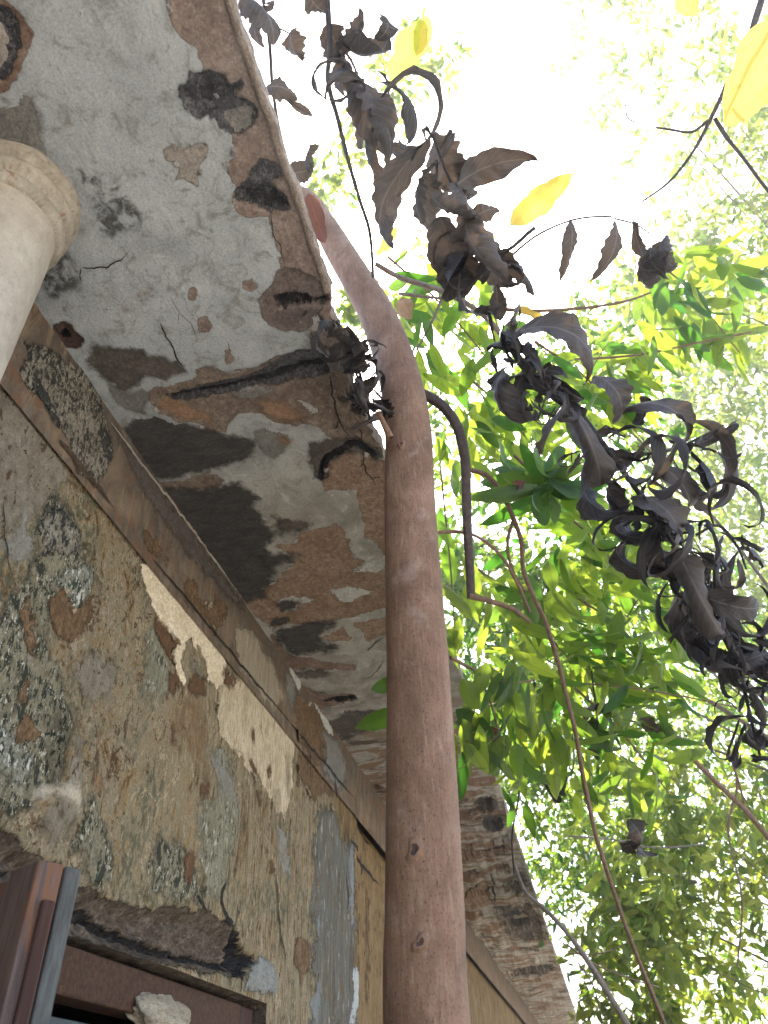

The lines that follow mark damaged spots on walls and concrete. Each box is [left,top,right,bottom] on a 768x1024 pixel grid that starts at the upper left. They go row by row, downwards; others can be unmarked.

peeling [0,0,34,93]
crack [79,252,128,283]
peeling [148,0,386,673]
crack [160,299,384,487]